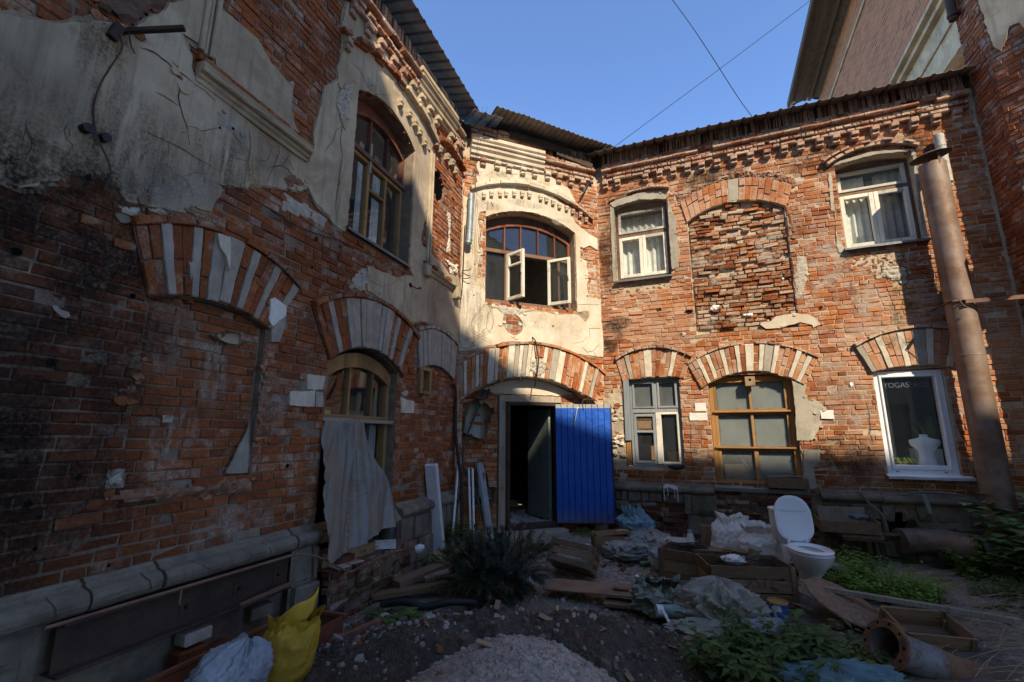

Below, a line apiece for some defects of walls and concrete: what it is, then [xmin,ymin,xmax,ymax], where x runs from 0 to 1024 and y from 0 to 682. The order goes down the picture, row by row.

crack [138,47,292,206]
crack [326,66,391,217]
spalling [485,302,559,340]